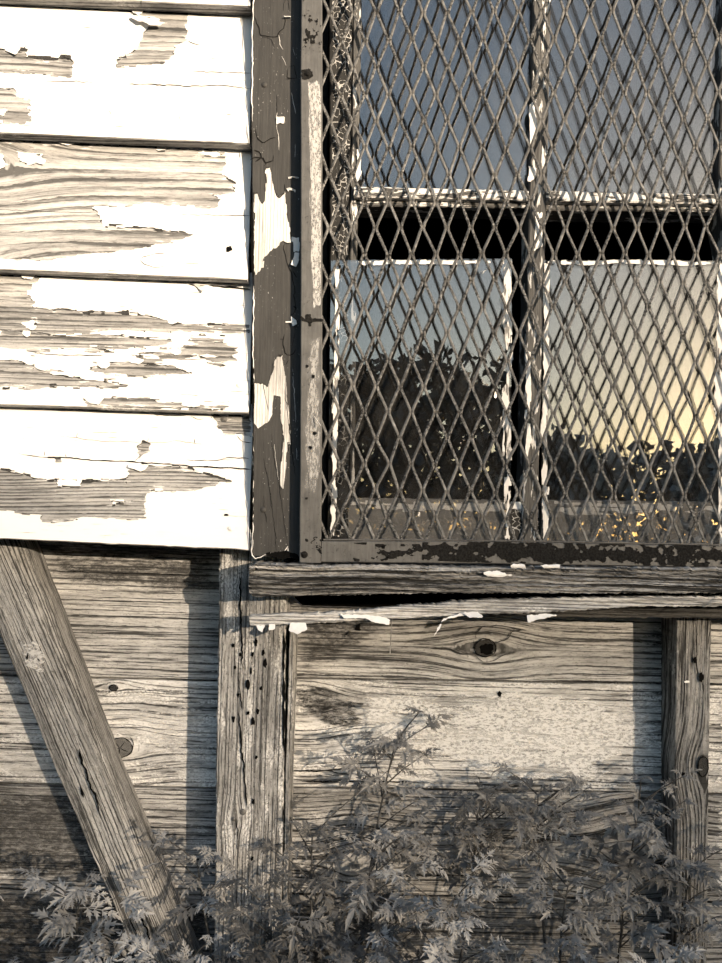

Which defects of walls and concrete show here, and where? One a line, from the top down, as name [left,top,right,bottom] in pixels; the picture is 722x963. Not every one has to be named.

peeling [0,46,74,78]
peeling [116,10,188,68]
peeling [0,88,32,125]
peeling [0,140,236,261]
crack [190,283,250,291]
crack [283,242,297,315]
peeling [0,274,291,489]
peeling [0,440,232,523]
crack [22,337,297,851]
peeling [340,614,390,625]
peeling [434,612,483,636]
peeling [527,613,557,623]